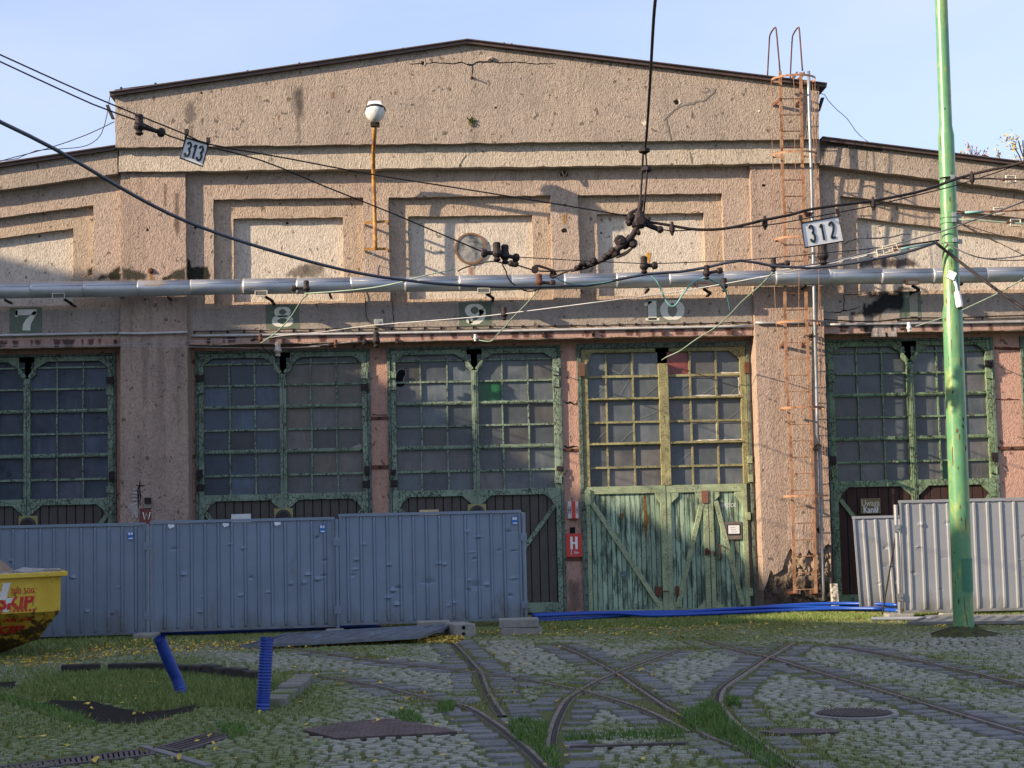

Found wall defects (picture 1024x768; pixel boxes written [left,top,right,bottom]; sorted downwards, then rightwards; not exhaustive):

crack [414,61,555,75]
crack [664,87,716,164]
flaking render [764,544,831,606]